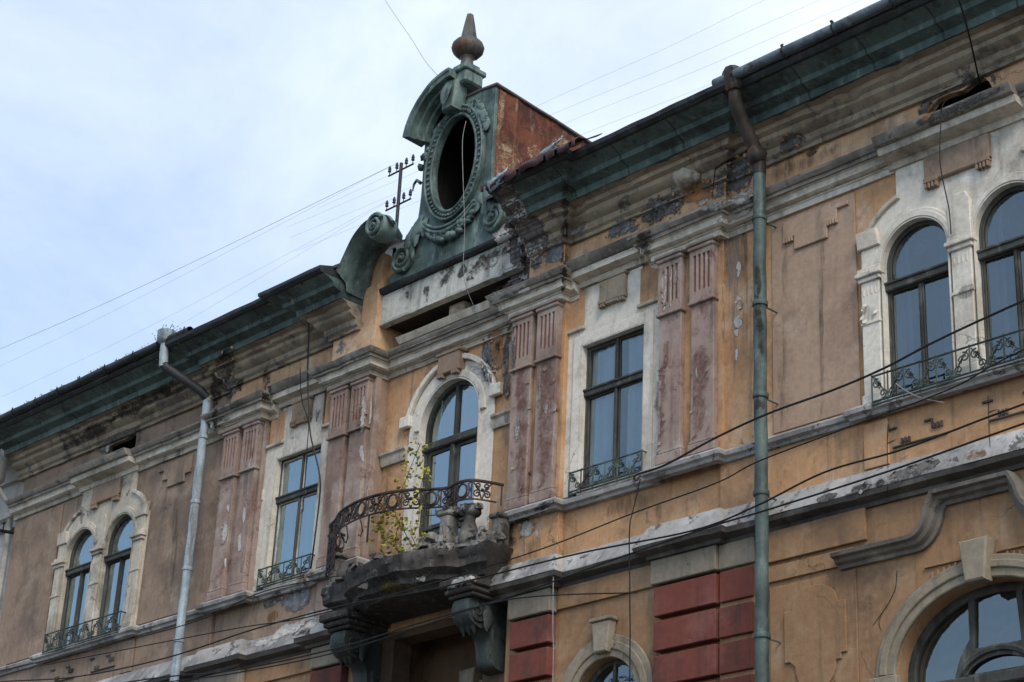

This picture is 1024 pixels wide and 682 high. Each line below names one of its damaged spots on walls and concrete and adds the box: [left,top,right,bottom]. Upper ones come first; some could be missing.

peeling [779,132,817,157]
spalling [605,153,758,239]
spalling [490,191,586,302]
spalling [207,346,243,431]
spalling [470,322,559,487]
peeling [816,479,884,502]
spalling [252,582,317,647]
crack [873,571,897,630]